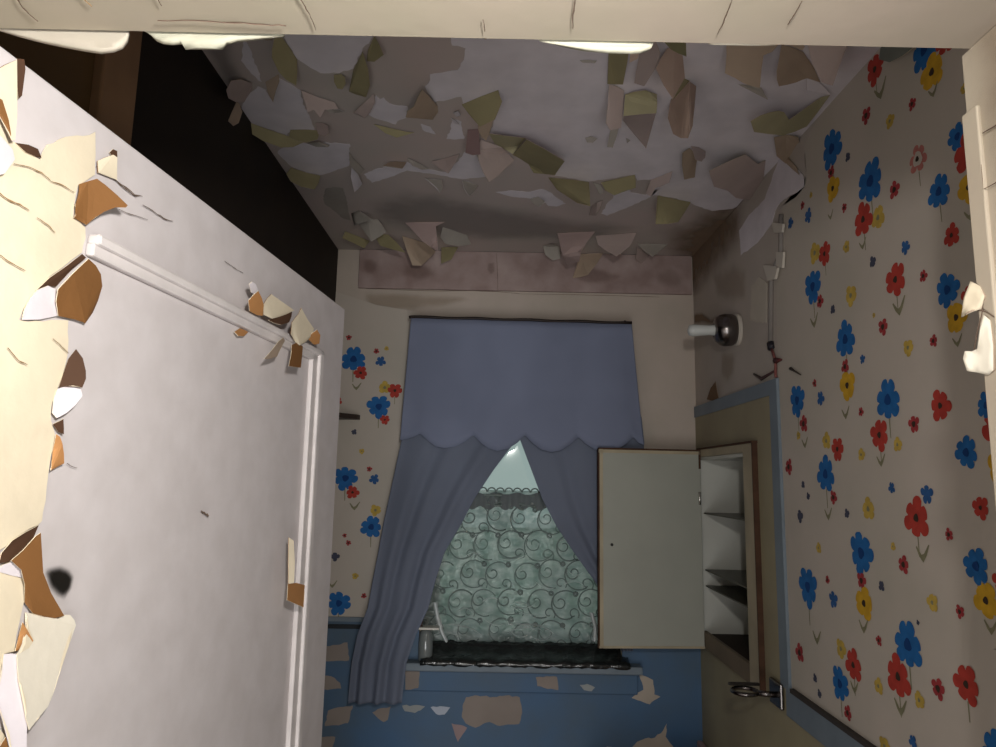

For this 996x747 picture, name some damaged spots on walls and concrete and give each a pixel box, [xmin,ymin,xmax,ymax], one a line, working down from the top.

crack [158,0,286,26]
peeling [0,59,42,175]
peeling [74,149,128,225]
peeling [145,31,881,266]
peeling [21,254,102,323]
peeling [248,282,320,368]
peeling [961,281,996,375]
peeling [50,349,86,470]
peeling [287,537,305,607]
peeling [0,525,76,747]
spalling [452,695,522,741]
spalling [632,675,660,704]